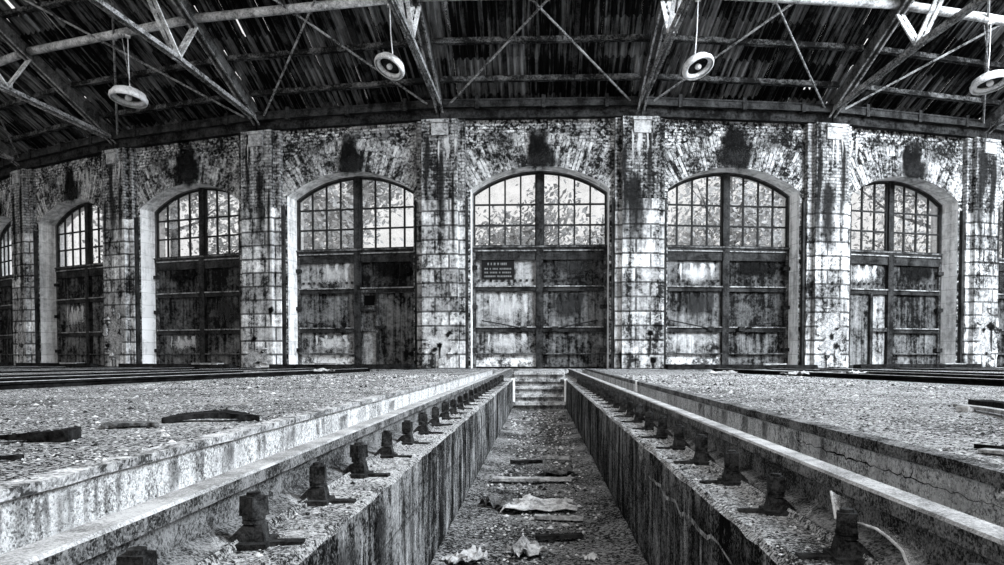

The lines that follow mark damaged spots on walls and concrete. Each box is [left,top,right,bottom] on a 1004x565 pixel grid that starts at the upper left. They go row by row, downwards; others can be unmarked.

leakage [177,142,197,181]
leakage [340,131,360,172]
leakage [528,126,549,166]
leakage [723,124,749,165]
leakage [903,139,944,178]